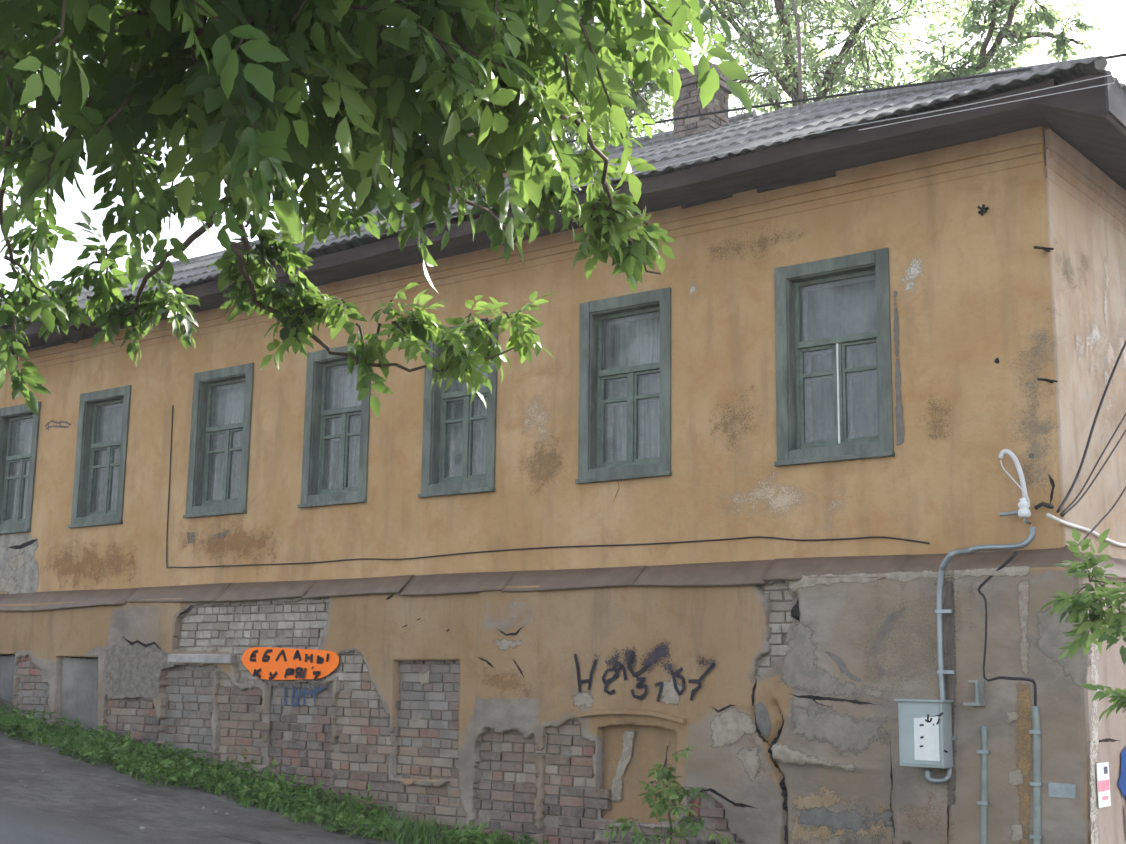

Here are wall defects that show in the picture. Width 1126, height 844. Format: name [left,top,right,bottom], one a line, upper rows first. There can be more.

leakage [1015,333,1053,485]
flaking render [0,533,39,594]
flaking render [17,656,52,723]
flaking render [97,598,744,844]
crack [700,788,756,808]
flaking render [710,707,760,781]
crack [712,679,882,844]